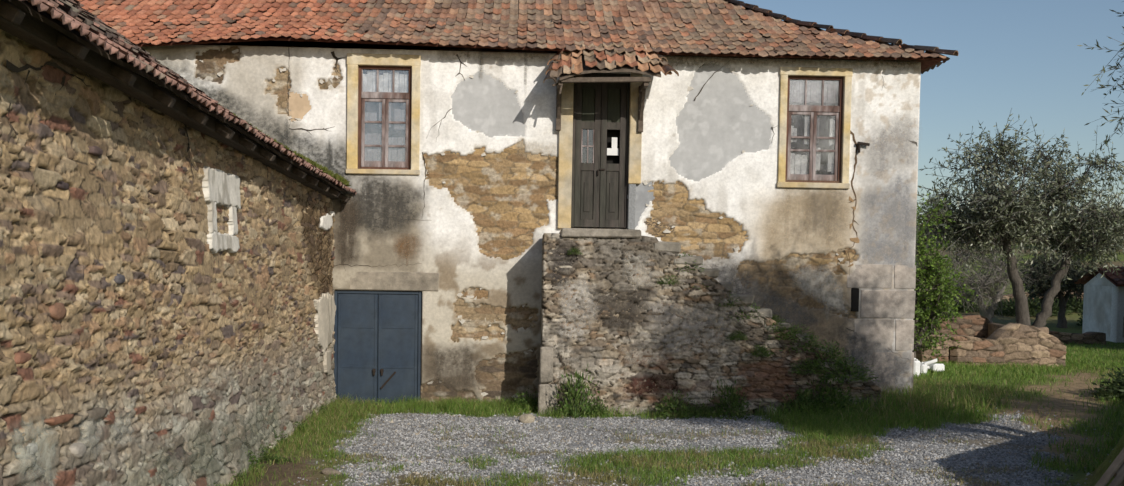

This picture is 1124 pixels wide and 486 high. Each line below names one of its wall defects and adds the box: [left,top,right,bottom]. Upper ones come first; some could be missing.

flaking render [195,46,241,84]
flaking render [265,67,311,122]
flaking render [318,64,343,90]
water stain [195,84,421,296]
flaking render [423,72,558,260]
peeling [627,63,859,318]
crack [844,130,859,270]
flaking render [421,287,538,403]